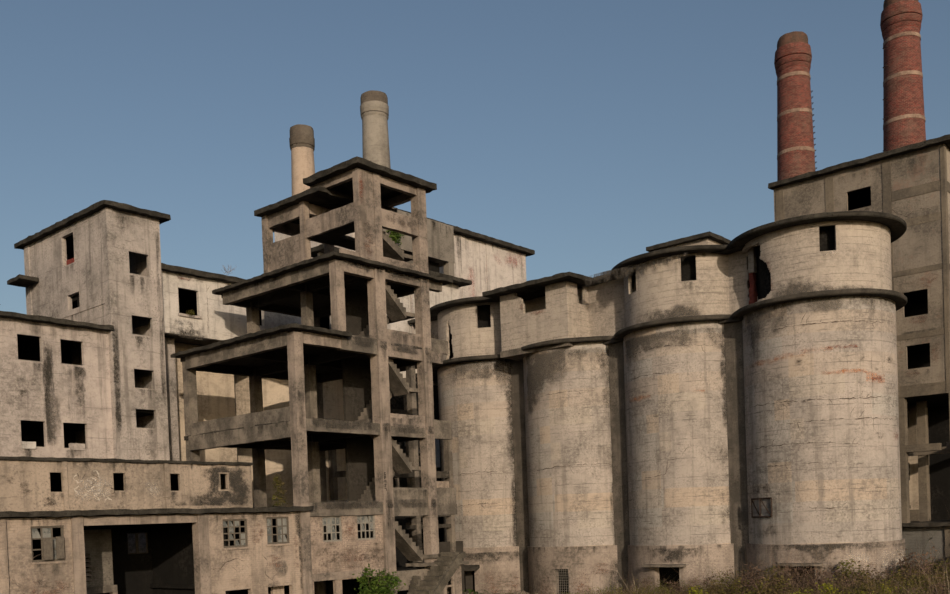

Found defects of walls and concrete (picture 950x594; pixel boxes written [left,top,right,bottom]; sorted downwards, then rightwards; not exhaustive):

leakage [38,348,59,434]
leakage [455,360,514,458]
leakage [526,350,585,410]
leakage [172,467,265,516]